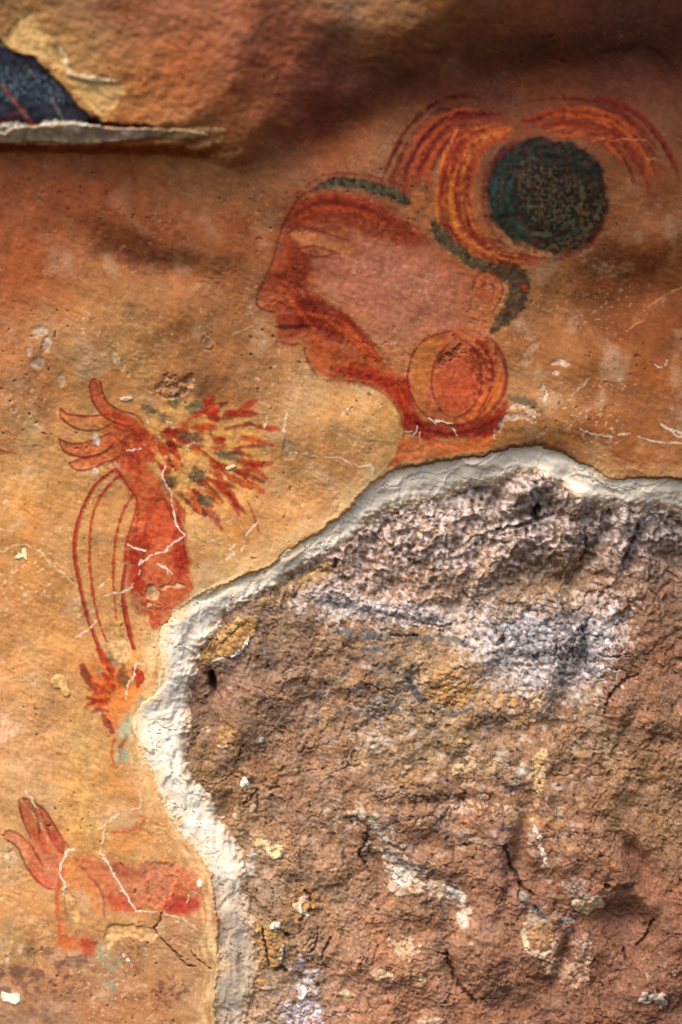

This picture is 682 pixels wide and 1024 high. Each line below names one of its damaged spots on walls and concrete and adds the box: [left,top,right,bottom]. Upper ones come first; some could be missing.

peeling [0,7,244,161]
crack [126,418,172,452]
crack [0,465,186,639]
peeling [144,582,186,611]
crack [224,520,260,561]
spalling [185,470,682,1024]
crack [58,791,212,971]